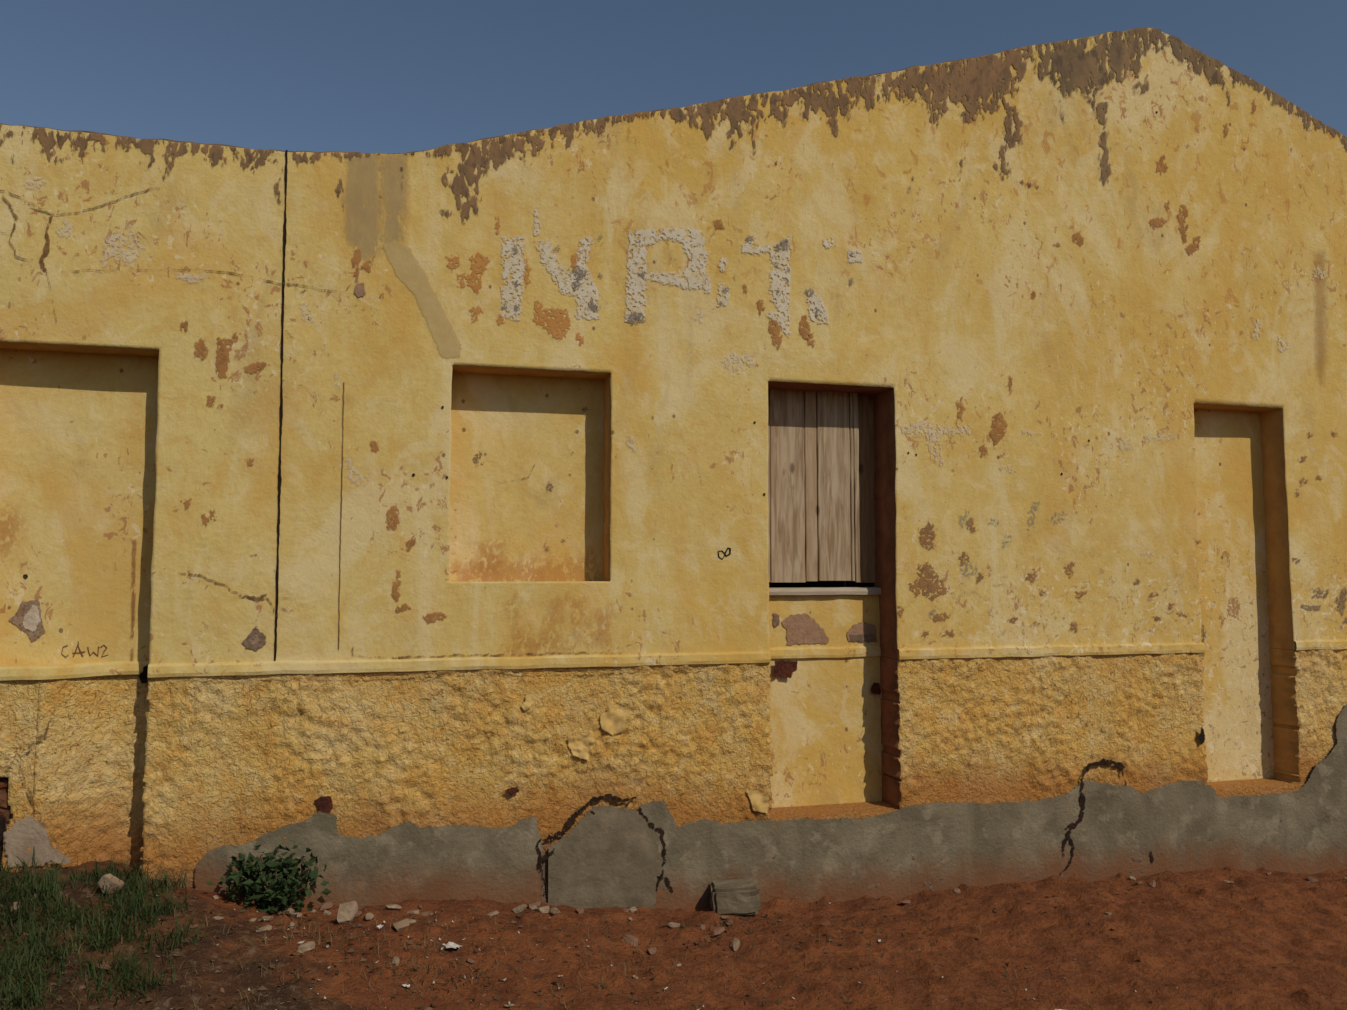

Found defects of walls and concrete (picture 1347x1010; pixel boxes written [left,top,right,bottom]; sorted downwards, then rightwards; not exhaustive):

peeling [412,45,1043,224]
crack [0,188,150,302]
damp [335,155,406,256]
peeling [1149,200,1201,256]
crack [139,150,764,680]
spalling [9,600,45,642]
spalling [773,613,829,678]
peeling [898,520,955,639]
peeling [0,777,71,871]
crack [534,794,673,897]
peeling [640,704,1347,909]
crack [1060,758,1127,875]